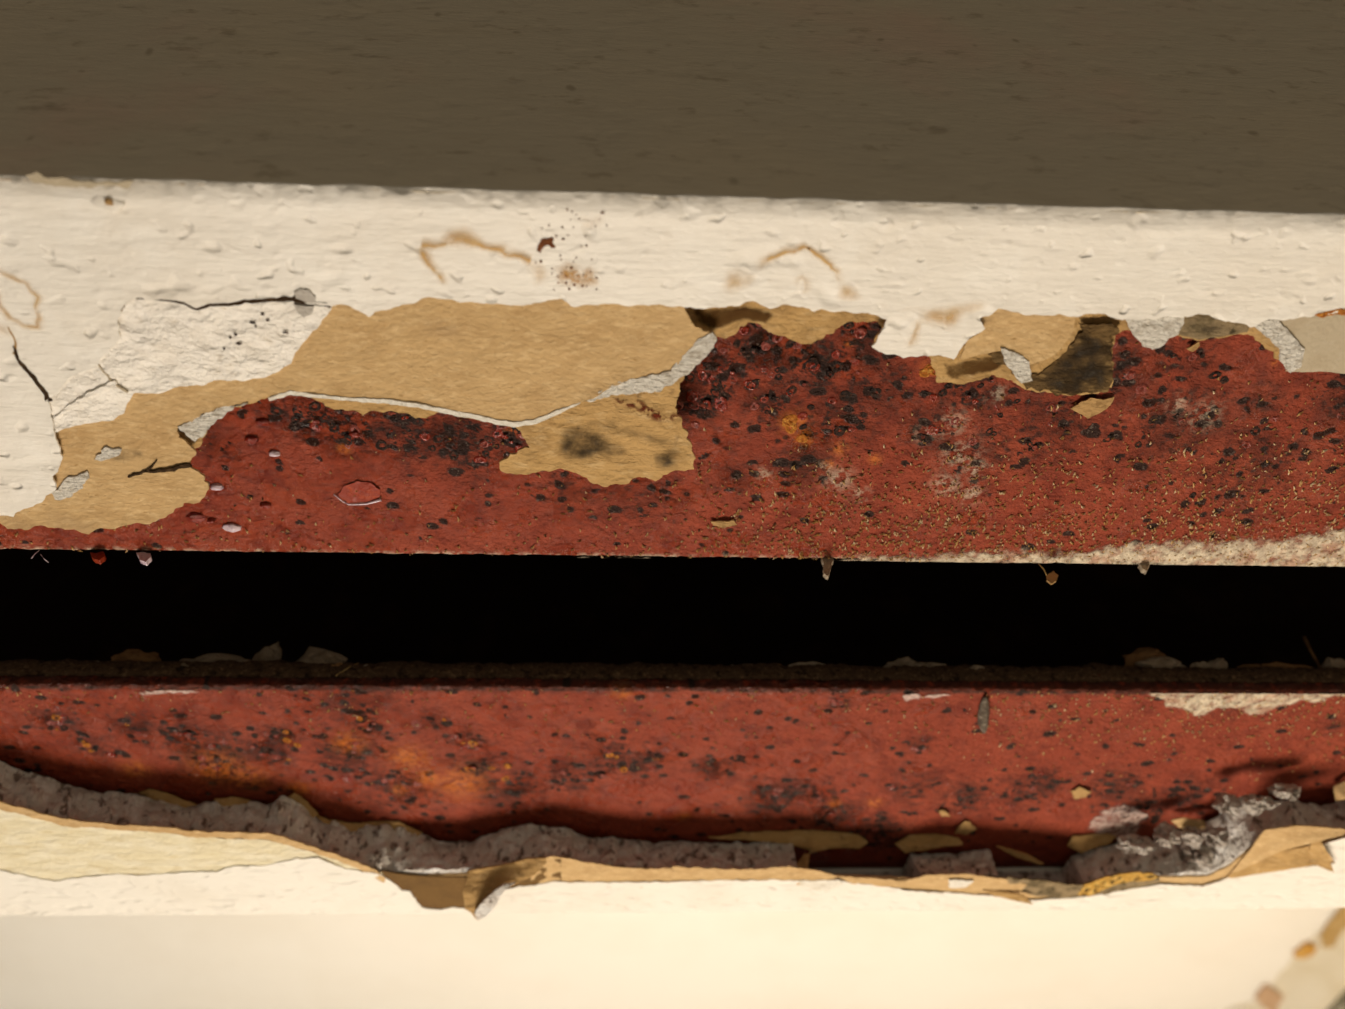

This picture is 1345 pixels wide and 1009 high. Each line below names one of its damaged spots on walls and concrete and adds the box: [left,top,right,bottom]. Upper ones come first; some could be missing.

damp [421,237,531,279]
damp [767,246,834,270]
crack [136,288,331,317]
corrosion [1314,309,1345,318]
crack [8,327,52,402]
corrosion [270,401,525,463]
peeling [0,297,886,535]
corrosion [676,321,881,443]
corrosion [917,364,994,444]
peeling [929,309,1345,396]
peeling [0,800,385,883]
peeling [1322,836,1345,863]